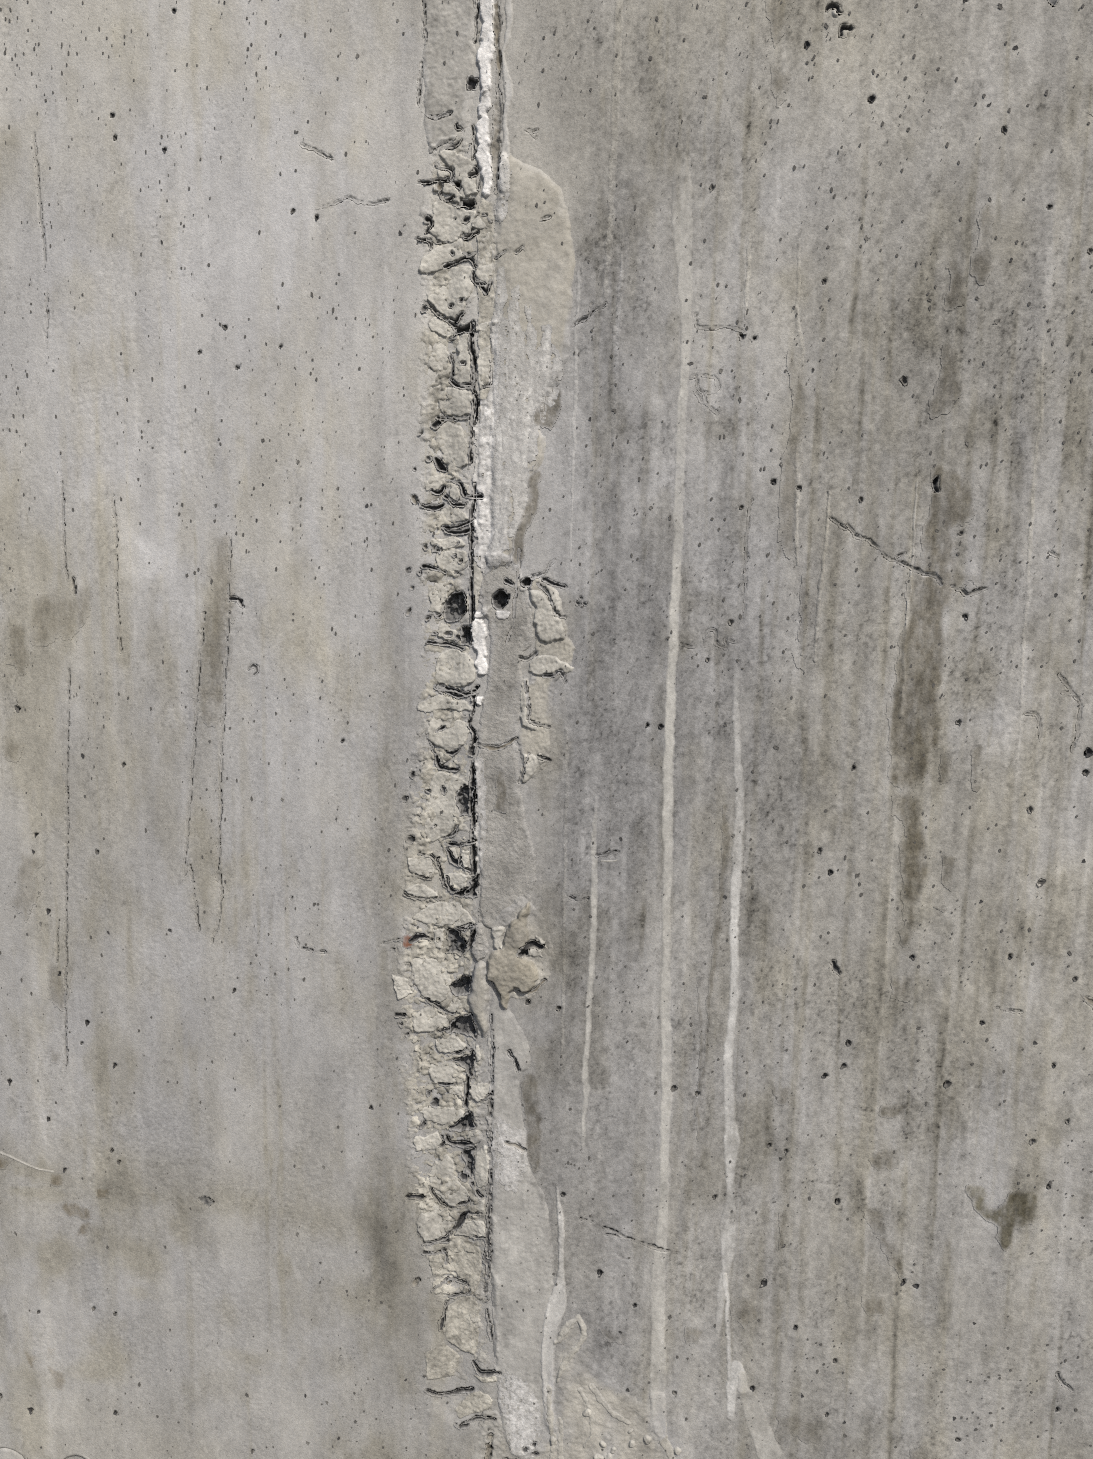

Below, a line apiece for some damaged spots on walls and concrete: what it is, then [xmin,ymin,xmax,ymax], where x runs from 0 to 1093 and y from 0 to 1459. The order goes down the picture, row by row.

crack [466,0,480,159]
spalling [392,112,539,1459]
crack [468,320,479,624]
crack [467,685,480,876]
spalling [504,558,588,784]
water stain [649,144,693,1459]
crack [829,515,988,597]
water stain [885,463,978,948]
crack [483,1013,520,1341]
water stain [497,1186,567,1459]
water stain [684,651,820,1459]
water stain [965,1184,1041,1251]